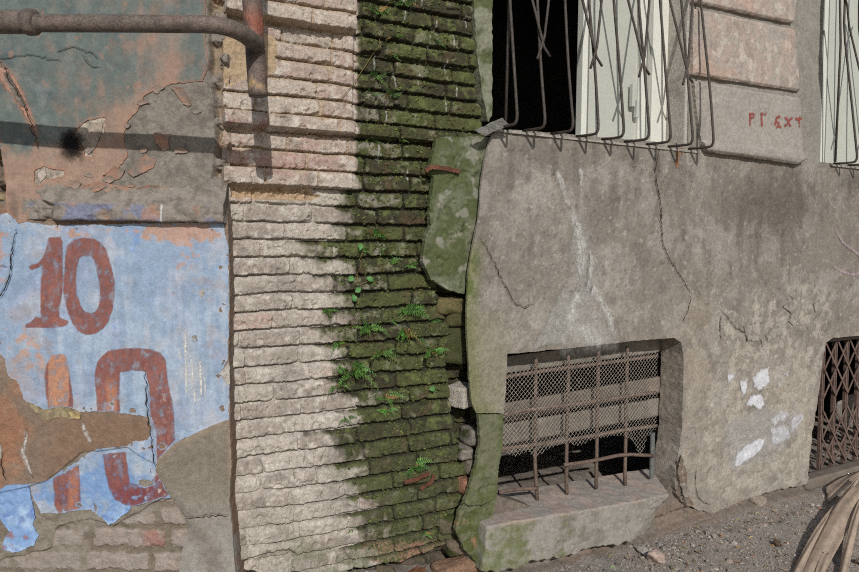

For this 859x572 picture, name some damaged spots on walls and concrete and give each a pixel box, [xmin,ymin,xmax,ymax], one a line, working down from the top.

peeling [0,62,37,133]
crack [1,47,98,148]
spalling [34,82,218,192]
crack [0,232,17,296]
efflorescence [571,214,613,329]
crack [655,150,692,323]
efflorescence [568,292,601,345]
spalling [27,402,82,420]
peeling [0,484,39,553]
peeling [101,504,131,525]